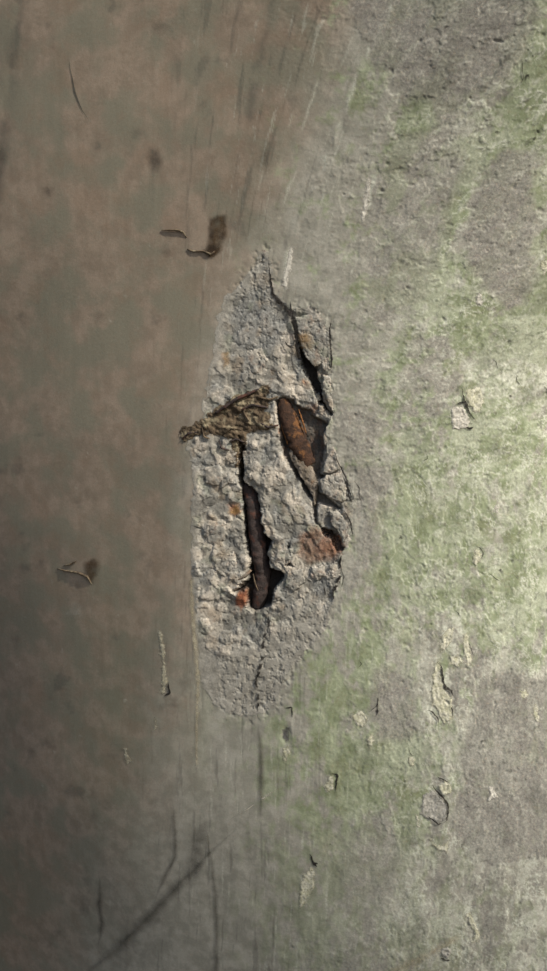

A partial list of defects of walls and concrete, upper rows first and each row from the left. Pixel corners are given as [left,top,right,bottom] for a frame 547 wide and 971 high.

crack [268,257,301,359]
crack [327,320,335,373]
peeling [451,387,484,429]
spalling [186,247,355,716]
crack [324,450,362,534]
crack [323,557,344,600]
peeling [416,777,452,827]